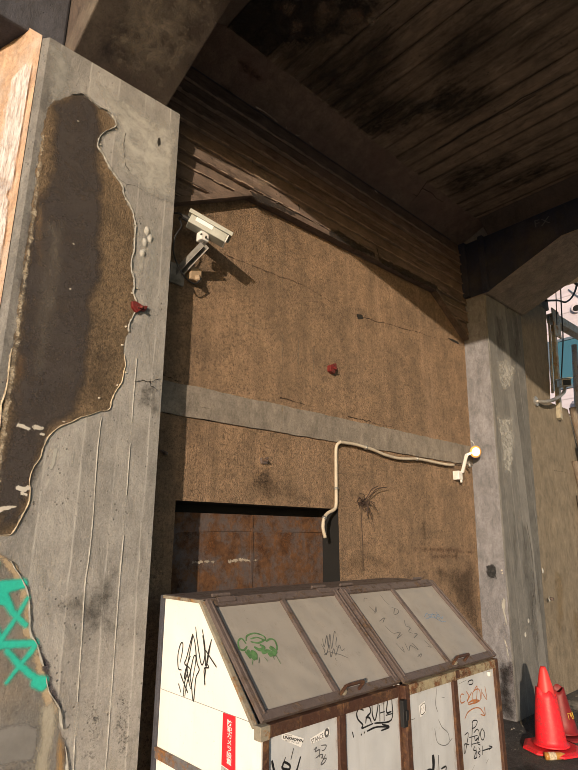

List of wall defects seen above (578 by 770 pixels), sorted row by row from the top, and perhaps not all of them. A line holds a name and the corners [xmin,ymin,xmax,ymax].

leakage [228,0,379,55]
peeling [0,64,31,249]
spalling [0,92,146,537]
crack [225,254,459,344]
spalling [0,555,70,770]